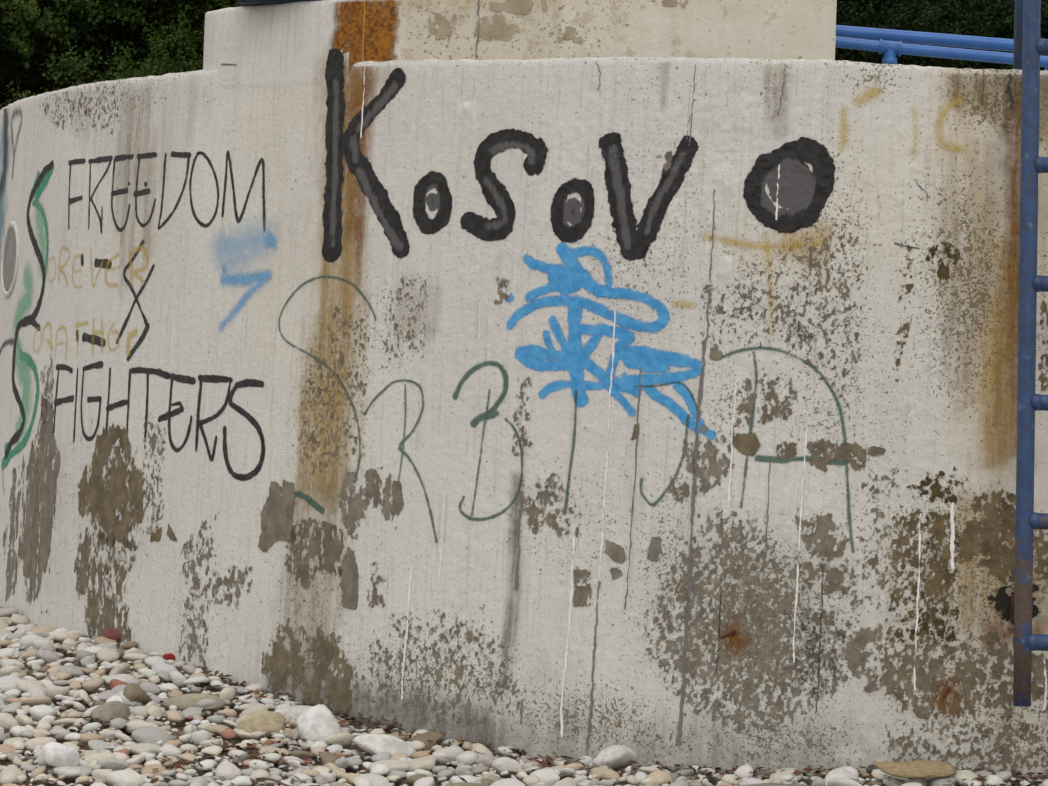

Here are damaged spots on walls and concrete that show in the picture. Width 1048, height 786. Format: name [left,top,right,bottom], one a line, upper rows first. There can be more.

corrosion [332,0,398,134]
corrosion [299,150,359,505]
corrosion [1010,118,1021,355]
damp [793,426,808,662]
damp [913,513,921,691]
damp [412,704,491,745]